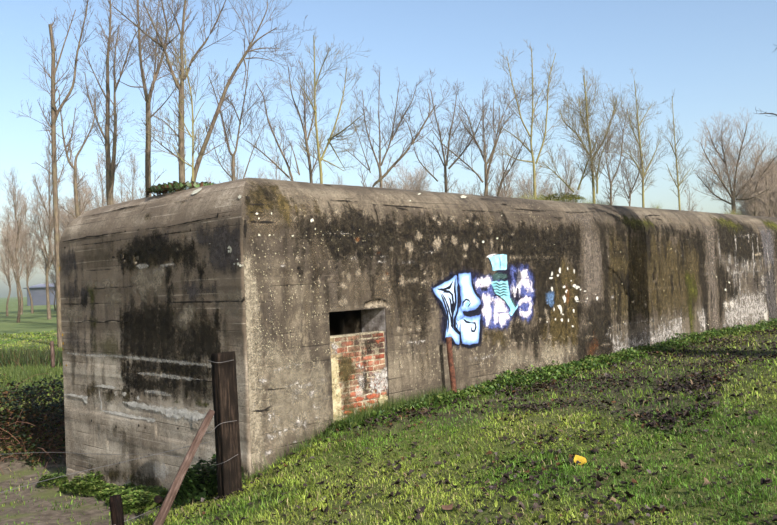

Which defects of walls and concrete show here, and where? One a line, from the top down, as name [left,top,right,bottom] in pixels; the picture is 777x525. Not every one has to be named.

damp [65,232,221,422]
damp [246,183,777,360]